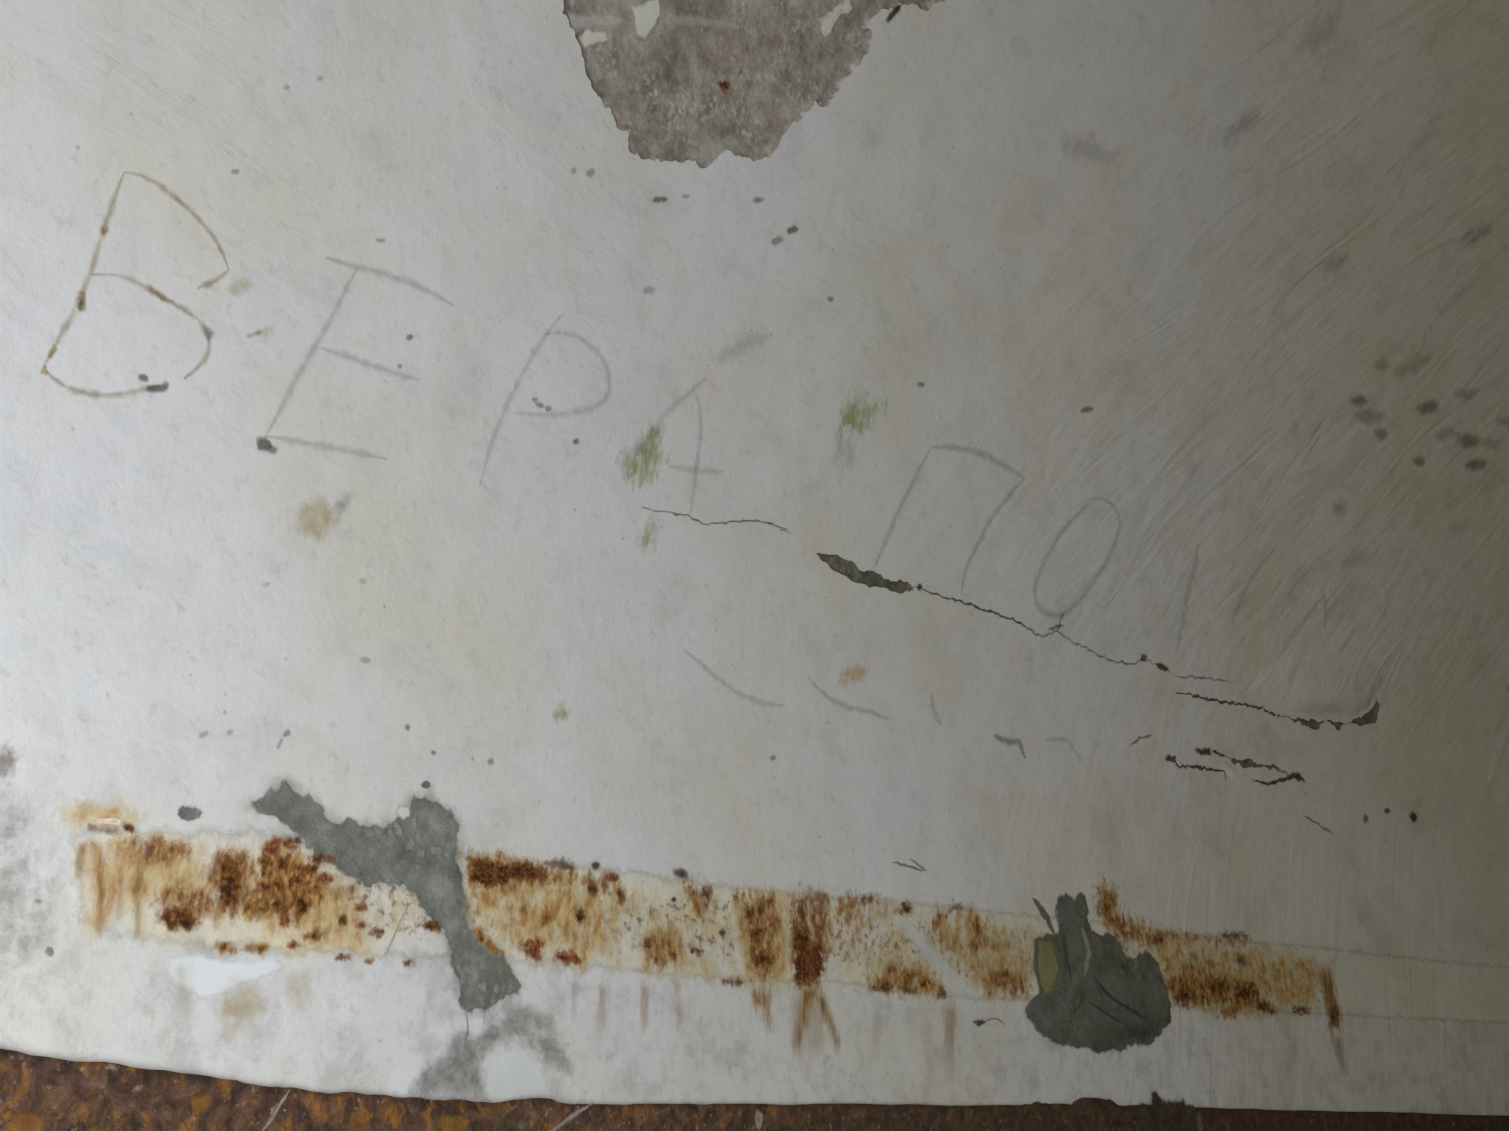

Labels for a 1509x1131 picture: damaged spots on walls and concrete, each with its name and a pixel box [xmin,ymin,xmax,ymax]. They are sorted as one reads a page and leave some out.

spalling [562,0,945,168]
crack [642,507,786,529]
crack [816,553,1042,638]
crack [1141,655,1380,730]
peeling [178,806,201,821]
corrosion [69,805,384,964]
peeling [252,781,521,1012]
corrosion [466,849,626,969]
corrosion [672,869,912,1044]
peeling [1026,893,1171,1053]
corrosion [0,1049,1143,1131]
corrosion [1195,1107,1509,1131]